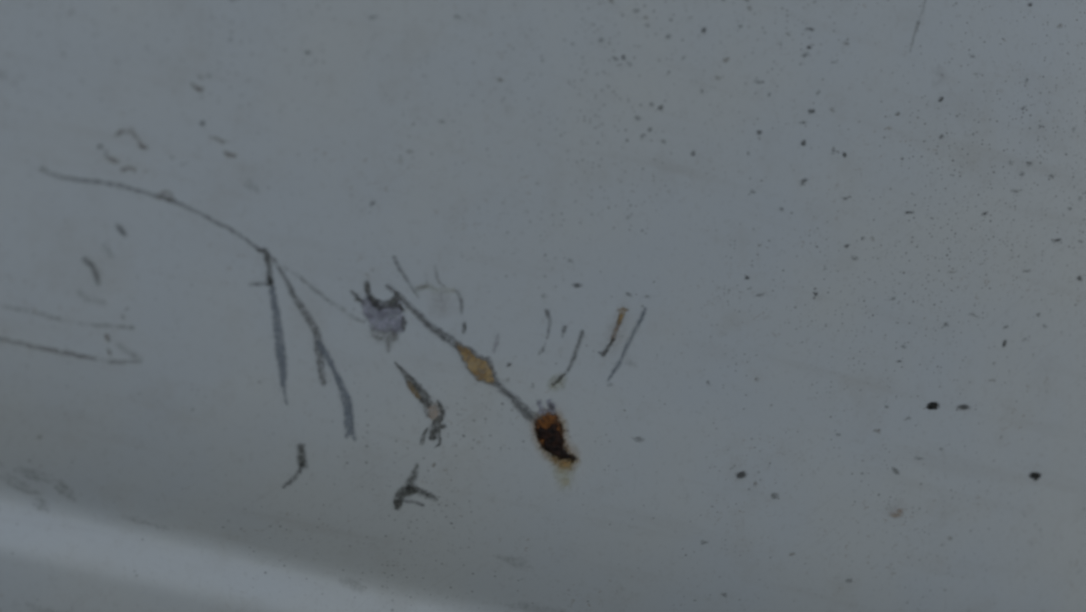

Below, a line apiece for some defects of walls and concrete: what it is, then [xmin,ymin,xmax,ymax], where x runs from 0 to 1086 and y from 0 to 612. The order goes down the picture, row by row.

peeling [355,281,406,333]
corrosion [535,400,576,467]